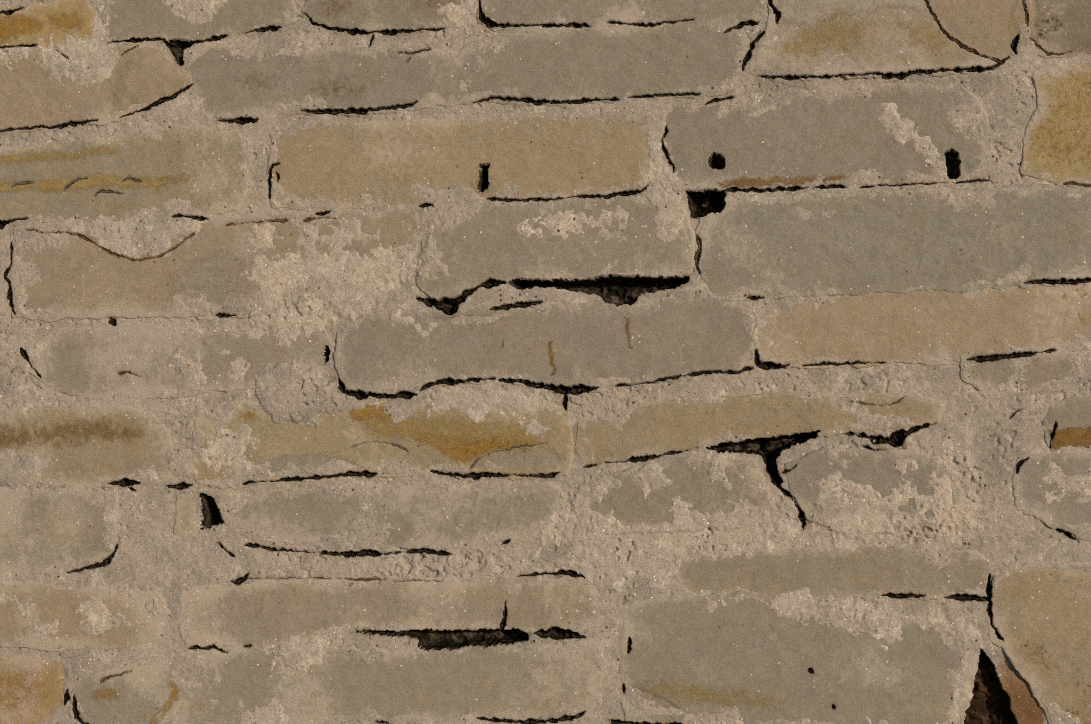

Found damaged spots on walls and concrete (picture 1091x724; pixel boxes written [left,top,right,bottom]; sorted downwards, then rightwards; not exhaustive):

crack [926,0,1018,63]
crack [4,229,193,315]
crack [770,465,806,530]